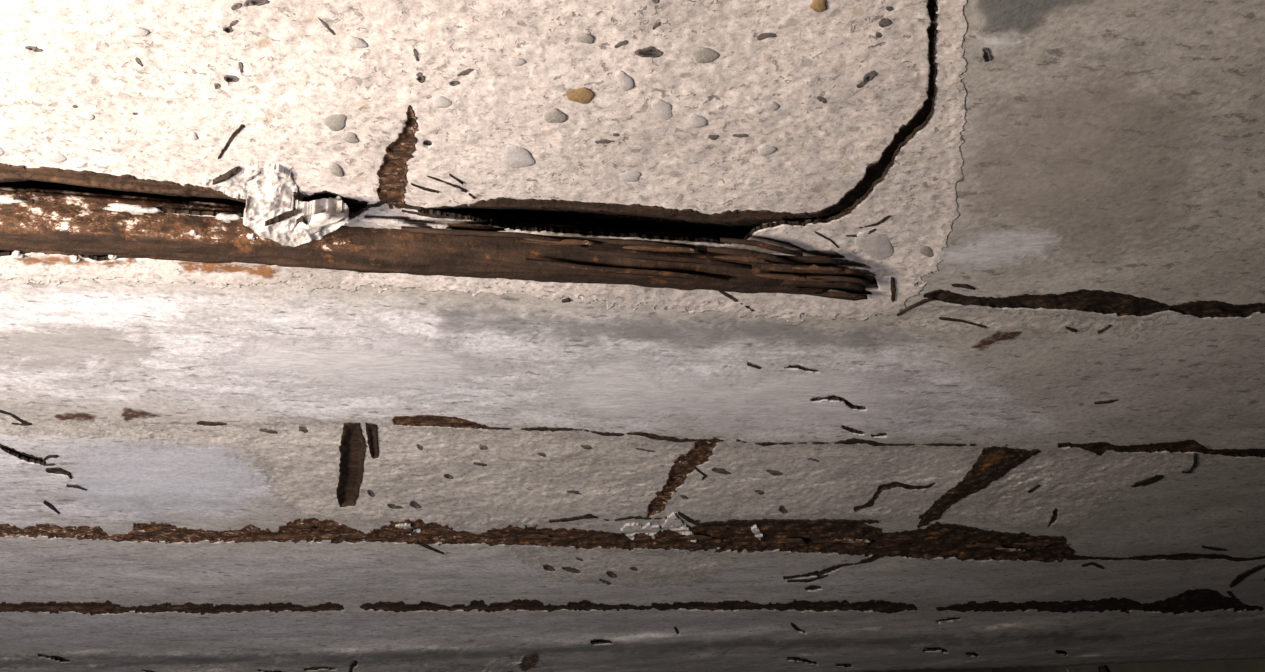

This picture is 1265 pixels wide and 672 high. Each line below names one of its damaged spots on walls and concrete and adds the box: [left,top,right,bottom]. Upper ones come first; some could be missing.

leakage [974,0,1082,47]
crack [353,0,938,248]
spalling [0,0,1265,339]
corrosion [17,257,132,265]
corrosion [180,262,275,278]
crack [483,362,1007,447]
crack [1094,397,1118,405]
crack [853,481,935,512]
crack [1028,484,1058,527]
crack [1066,545,1265,588]